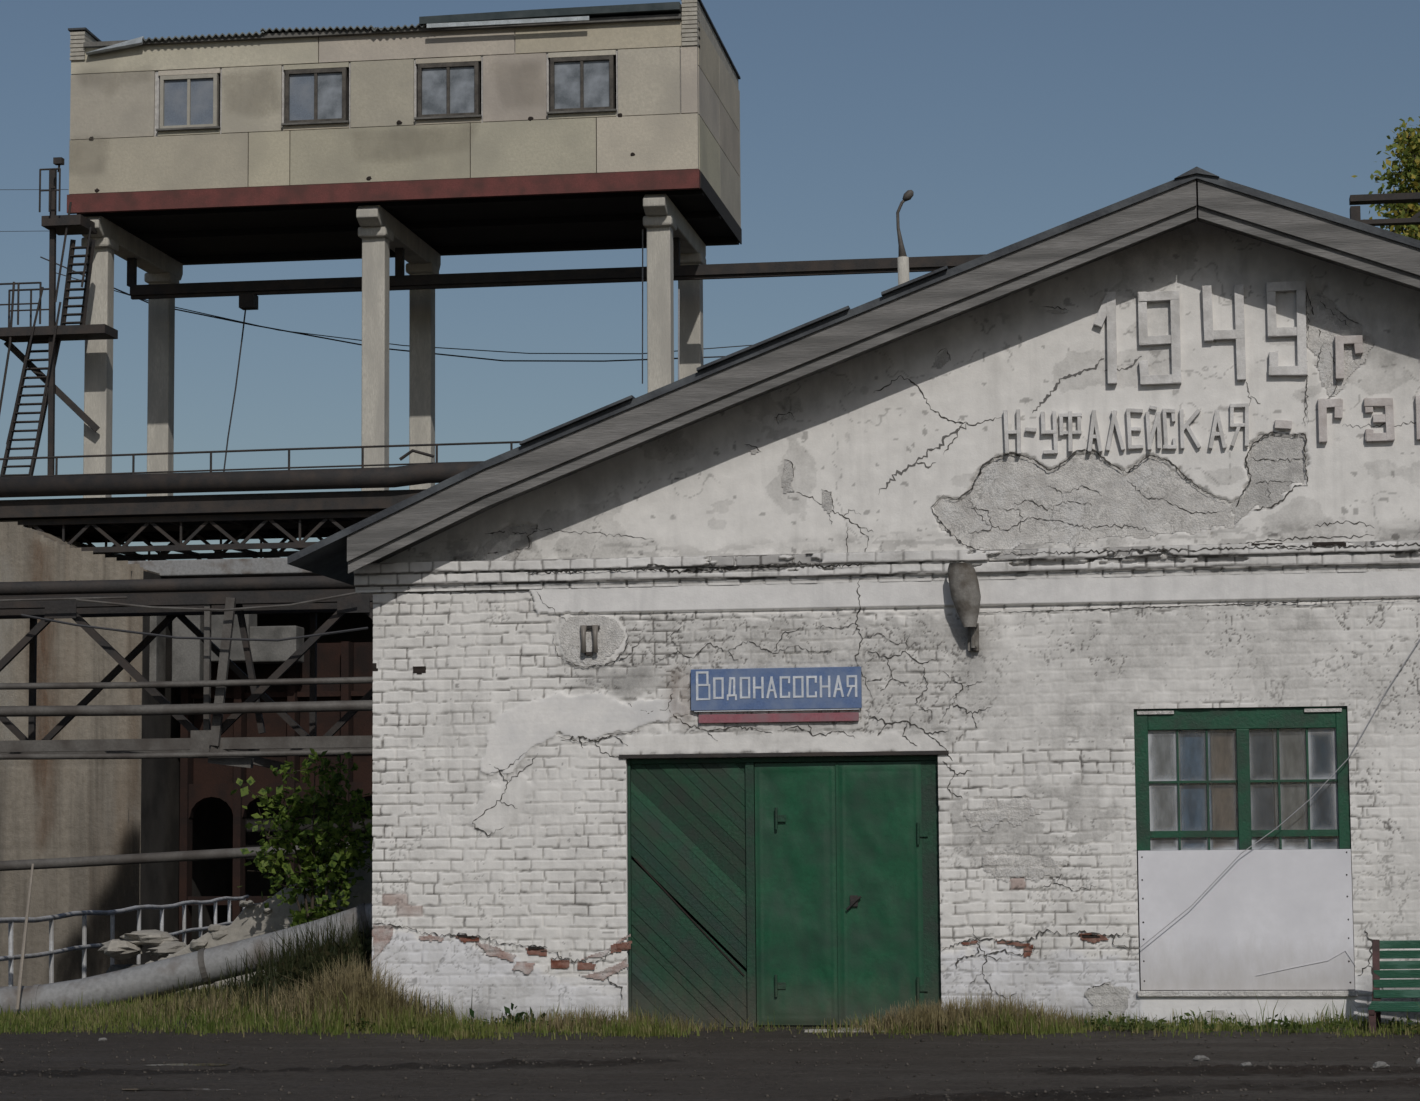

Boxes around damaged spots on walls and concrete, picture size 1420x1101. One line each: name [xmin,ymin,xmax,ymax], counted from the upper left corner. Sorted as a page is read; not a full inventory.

peeling [931,285,1375,550]
crack [472,356,1142,836]
peeling [481,693,691,775]
spalling [372,923,632,996]
spalling [941,929,1129,967]